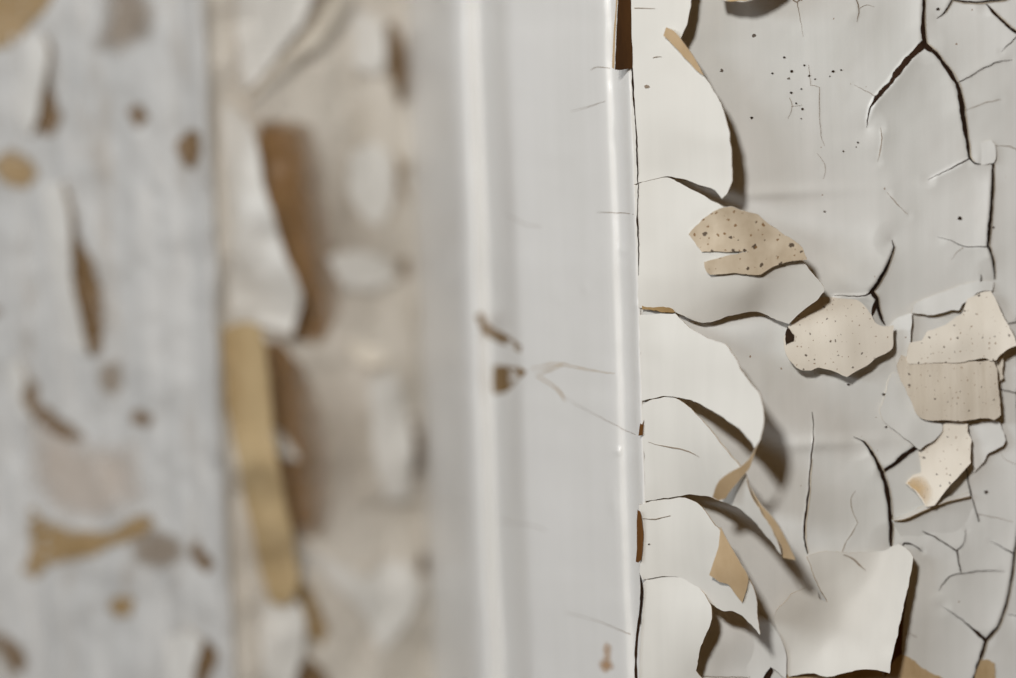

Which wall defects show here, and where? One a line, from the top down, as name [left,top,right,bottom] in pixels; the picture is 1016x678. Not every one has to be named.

crack [788,65,826,179]
crack [861,0,1016,282]
peeling [630,0,1016,678]
crack [839,241,895,325]
crack [803,413,814,554]
crack [842,490,865,570]
crack [854,437,1016,678]